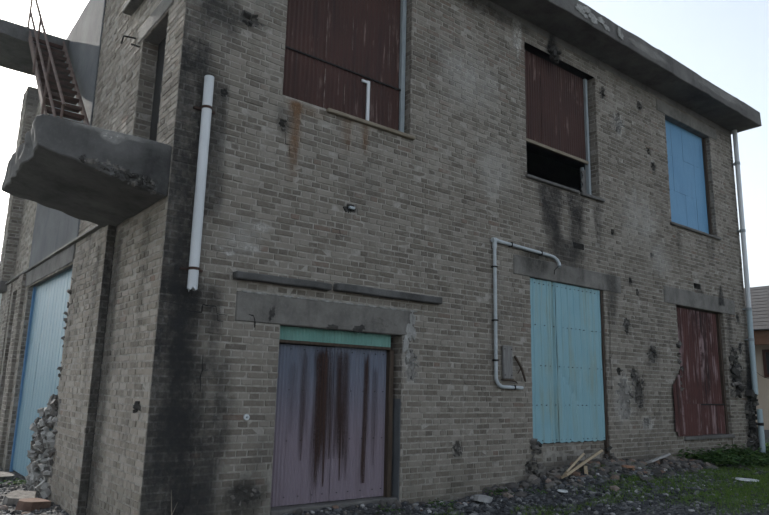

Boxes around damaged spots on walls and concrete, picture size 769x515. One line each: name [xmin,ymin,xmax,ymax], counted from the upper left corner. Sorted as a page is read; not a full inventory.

spalling [575,3,624,41]
water stain [540,184,583,263]
water stain [140,43,225,515]
corrosion [300,347,348,487]
flaking render [241,290,418,381]
corrosion [361,358,369,483]
spalling [616,366,644,408]
spalling [729,342,766,452]